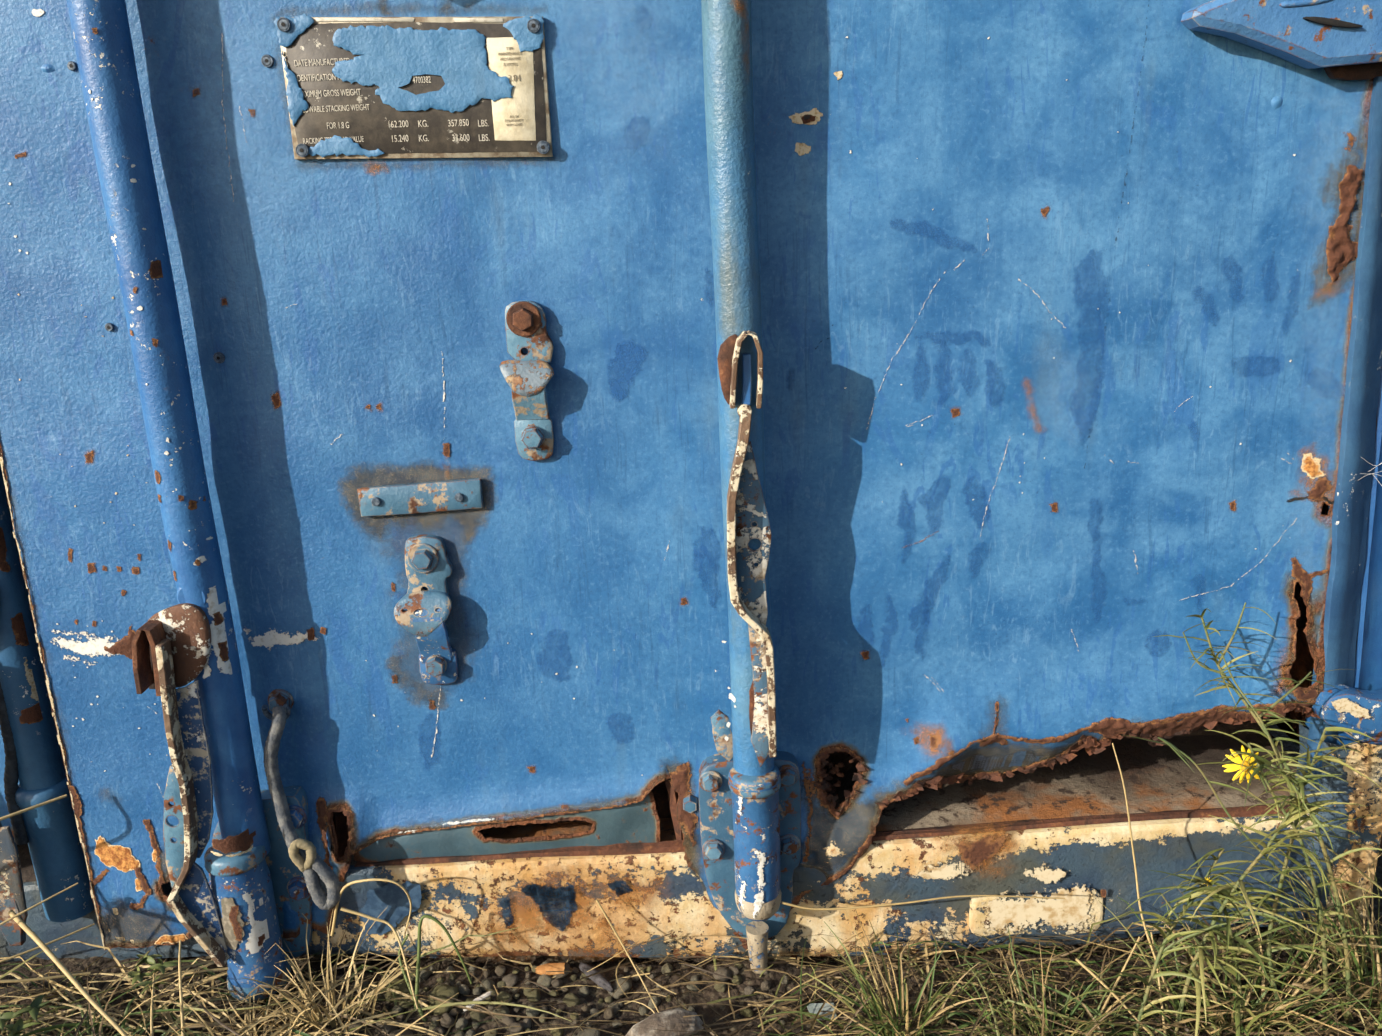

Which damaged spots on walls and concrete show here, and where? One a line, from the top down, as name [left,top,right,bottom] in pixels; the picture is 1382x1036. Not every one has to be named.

peeling [332,25,514,113]
peeling [309,135,385,158]
rust [1315,132,1365,302]
rust [1290,557,1328,600]
rust [0,443,141,950]
rust [875,666,1320,810]
rust [315,797,333,870]
rust [802,747,869,863]
peeling [359,881,422,936]
peeling [738,850,766,918]
peeling [912,861,976,882]
peeling [1023,861,1070,884]